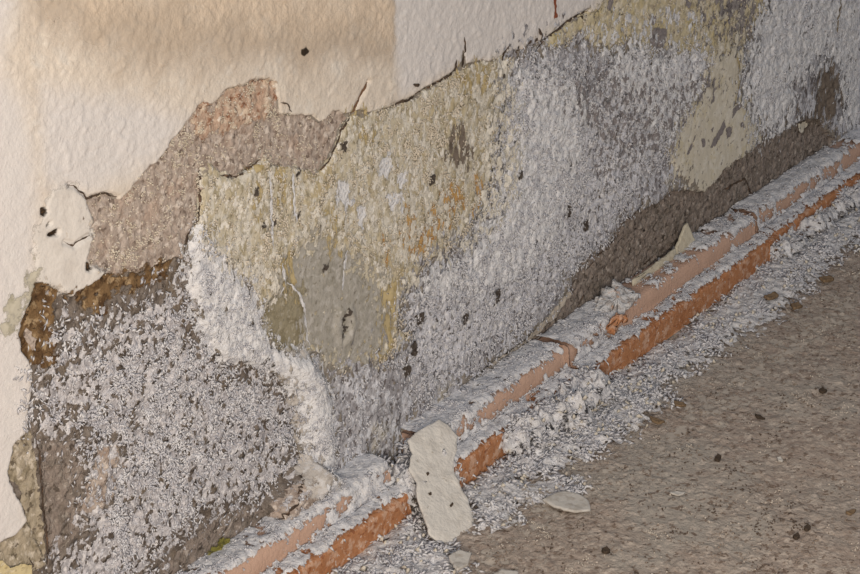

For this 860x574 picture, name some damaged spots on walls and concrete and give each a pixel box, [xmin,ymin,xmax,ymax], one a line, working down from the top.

damp [0,292,28,337]
spalling [0,50,529,574]
damp [16,31,725,574]
peeling [546,0,771,65]
spalling [520,119,835,344]
damp [536,0,860,369]
peeling [687,103,744,155]